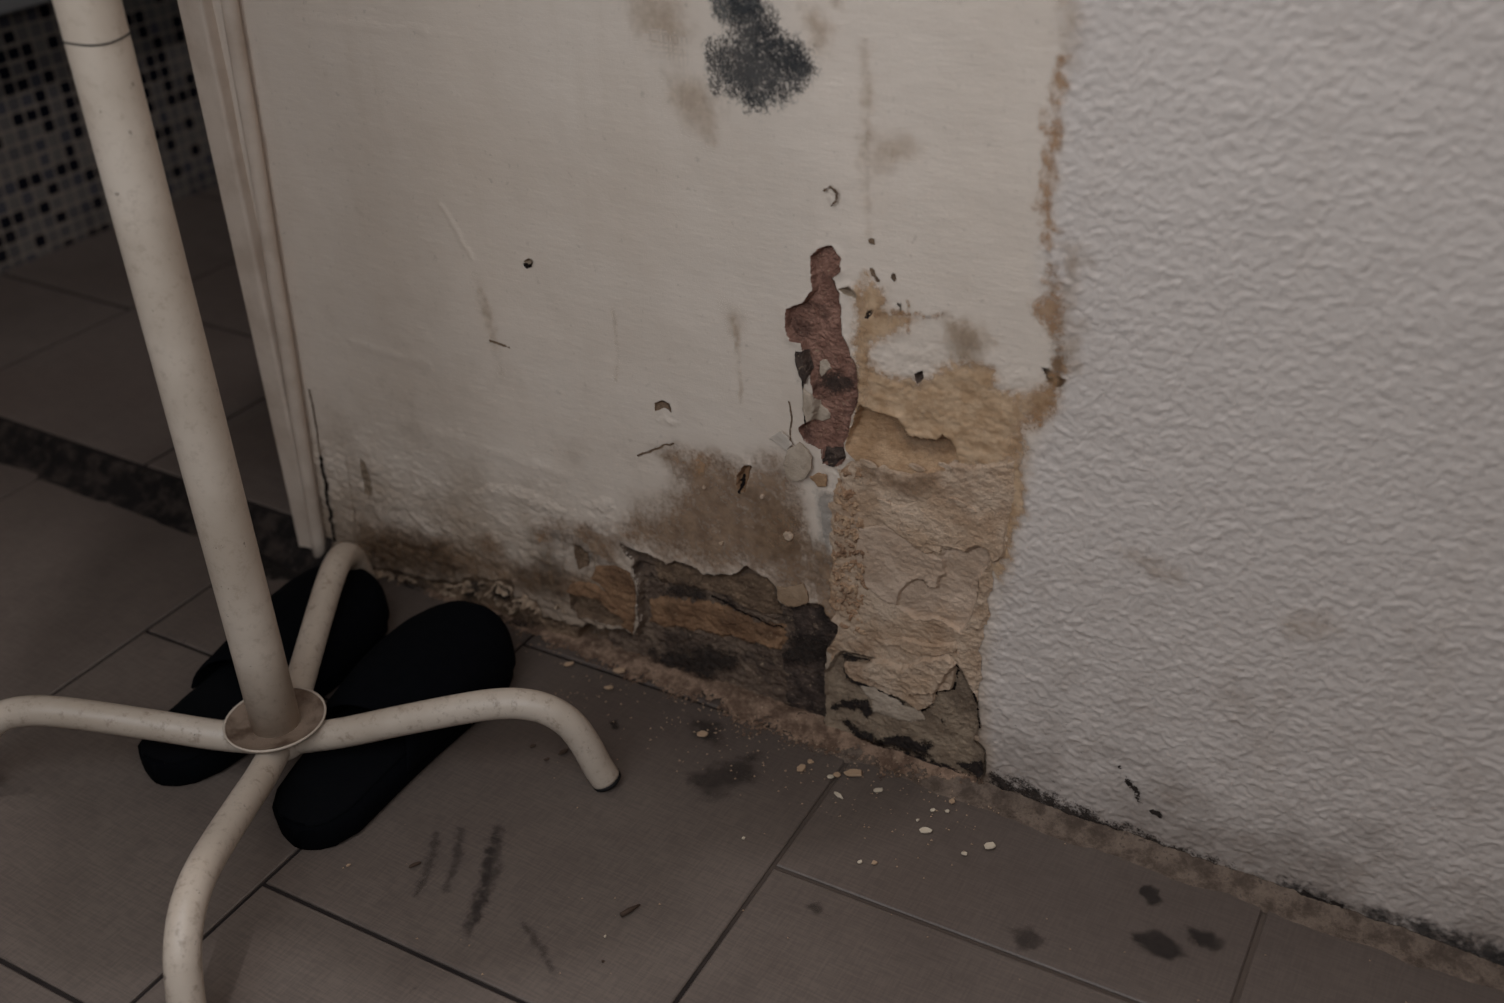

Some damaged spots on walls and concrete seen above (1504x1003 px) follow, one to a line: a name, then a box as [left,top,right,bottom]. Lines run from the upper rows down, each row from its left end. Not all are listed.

water stain [705,0,817,112]
water stain [357,451,812,594]
flaking render [362,245,1024,782]
water stain [988,771,1235,870]
water stain [1140,886,1160,904]
water stain [1135,929,1218,958]
water stain [1363,909,1504,967]